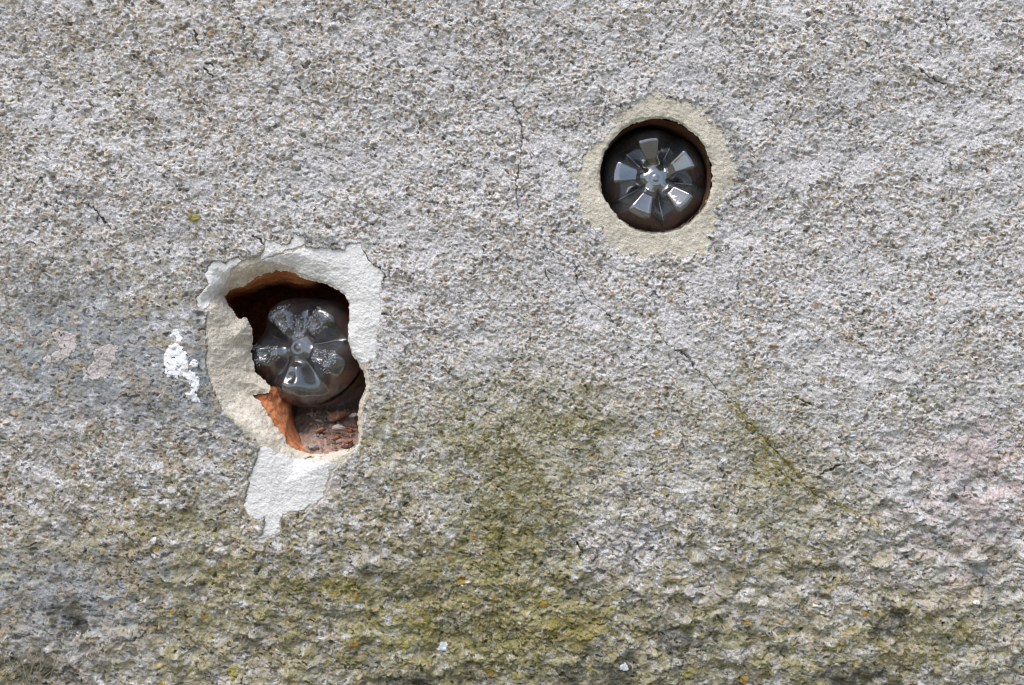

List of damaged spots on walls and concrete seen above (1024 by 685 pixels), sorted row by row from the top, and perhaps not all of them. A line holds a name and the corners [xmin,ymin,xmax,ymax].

flaking render [164,233,384,537]
damp [726,397,851,510]
damp [559,663,637,685]
damp [813,662,886,685]